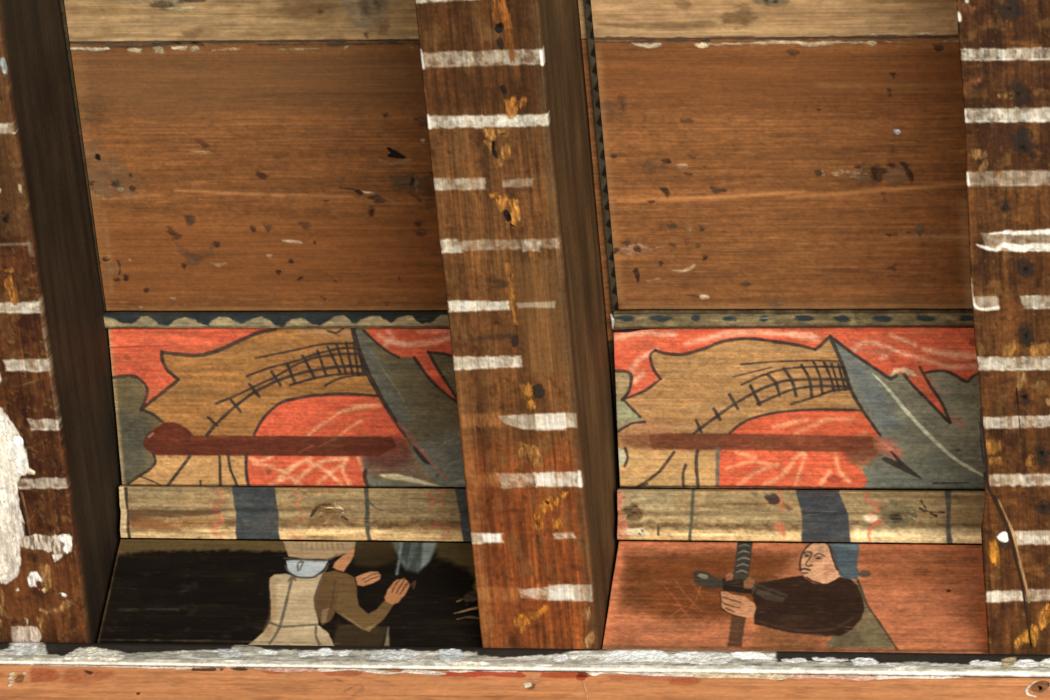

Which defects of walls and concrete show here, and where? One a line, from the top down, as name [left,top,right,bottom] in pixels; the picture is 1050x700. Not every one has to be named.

peeling [0,416,35,509]
crack [979,408,1033,648]
peeling [52,534,72,560]
peeling [0,632,517,675]
peeling [553,653,587,662]
peeling [587,651,960,681]
peeling [1001,657,1050,667]